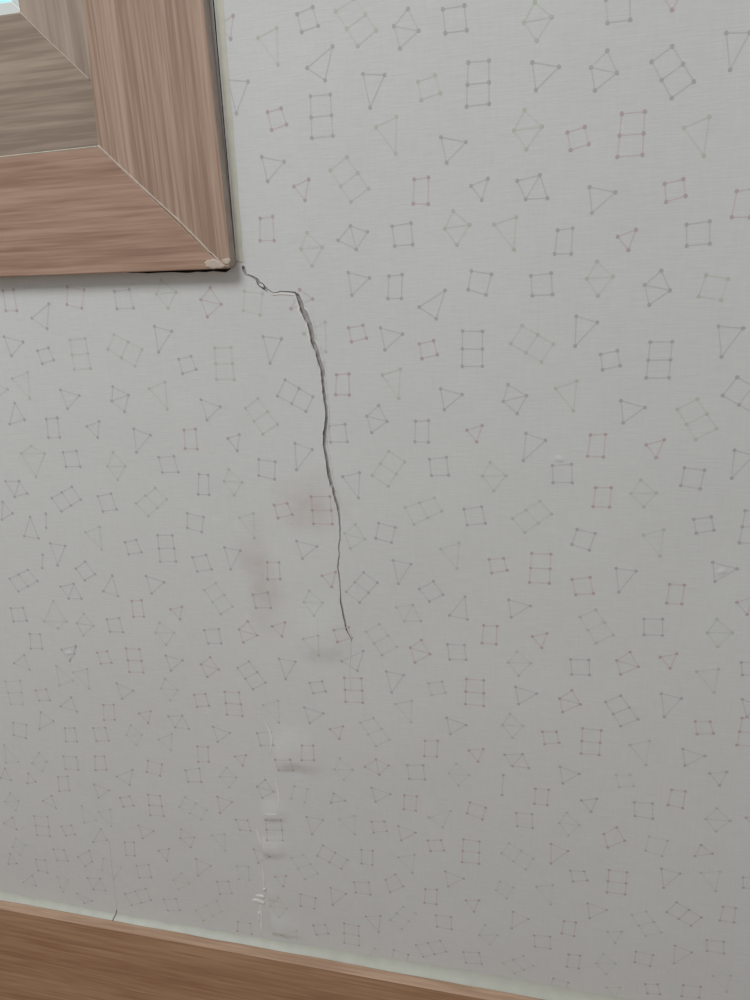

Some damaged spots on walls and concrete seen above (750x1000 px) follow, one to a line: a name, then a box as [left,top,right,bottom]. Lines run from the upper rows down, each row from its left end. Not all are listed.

crack [242,266,352,689]